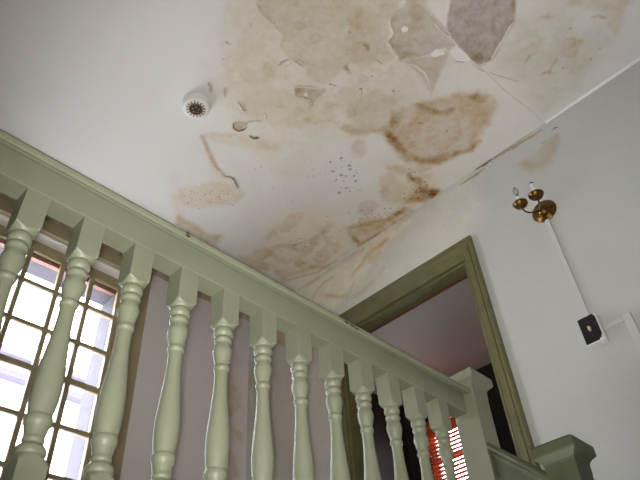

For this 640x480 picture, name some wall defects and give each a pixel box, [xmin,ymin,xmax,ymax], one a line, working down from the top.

peeling [218,0,519,140]
damp [45,215,73,232]
damp [152,268,169,282]
damp [163,0,640,316]